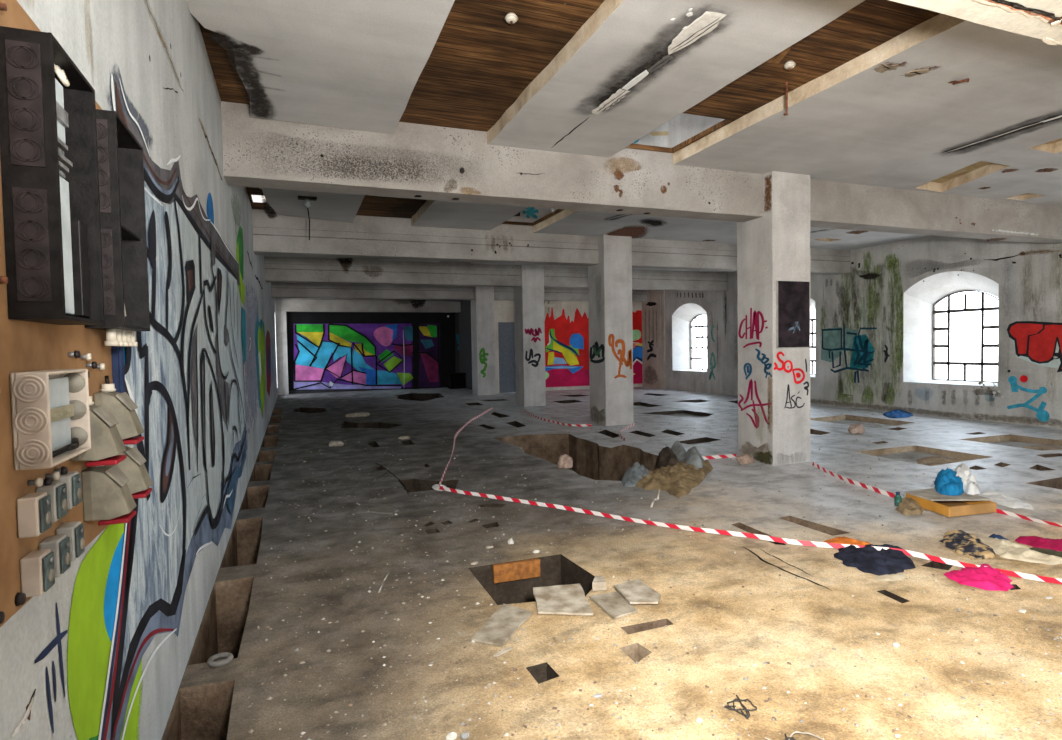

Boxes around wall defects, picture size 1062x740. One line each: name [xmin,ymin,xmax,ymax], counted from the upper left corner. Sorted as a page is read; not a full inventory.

crack [975,0,1062,27]
crack [146,1,184,93]
spalling [872,62,939,77]
peeling [939,114,1062,155]
rust [612,158,640,197]
water stain [844,253,903,382]